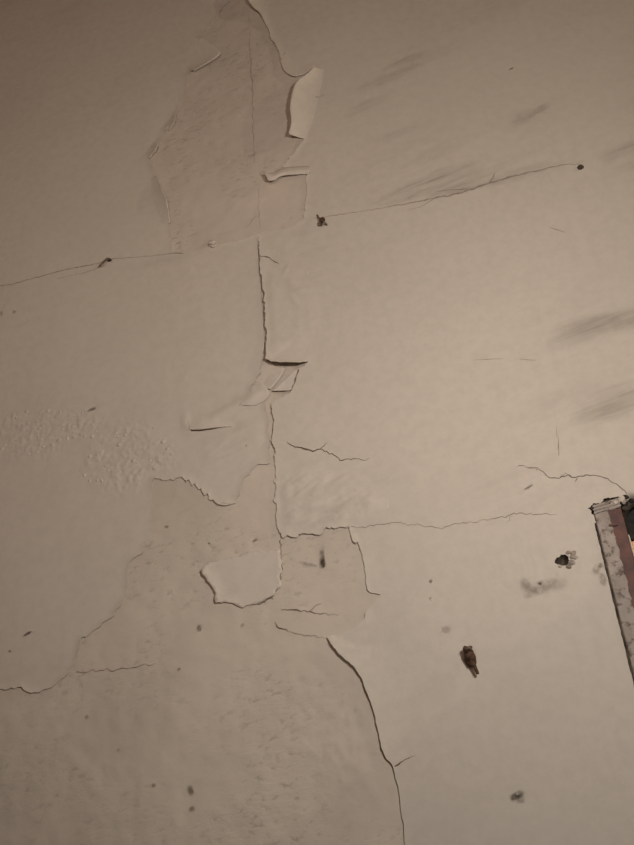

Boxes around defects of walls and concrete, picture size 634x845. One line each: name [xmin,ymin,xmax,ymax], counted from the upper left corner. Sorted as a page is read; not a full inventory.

peeling [147,0,324,254]
crack [317,164,567,218]
crack [0,252,183,286]
peeling [264,368,299,391]
crack [287,441,365,461]
crack [349,512,556,529]
peeling [0,460,405,845]